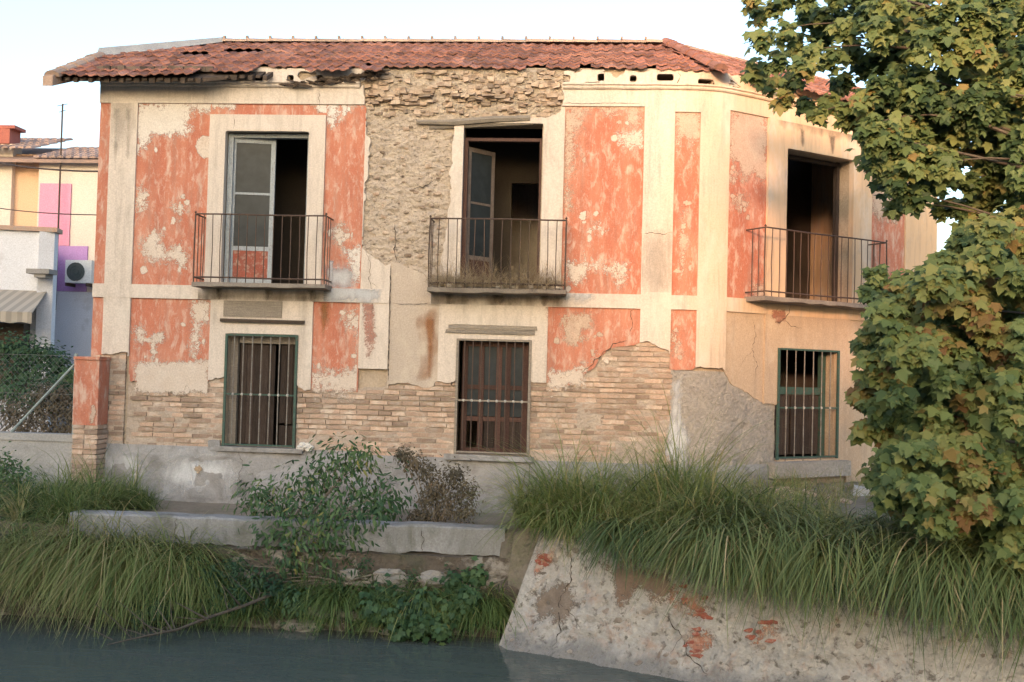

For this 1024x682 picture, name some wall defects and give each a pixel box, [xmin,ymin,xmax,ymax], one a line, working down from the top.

peeling [137,104,237,156]
peeling [135,184,150,216]
peeling [137,194,190,274]
spalling [313,68,644,292]
crack [583,310,633,372]
flaking render [296,307,455,457]
flaking render [529,309,685,465]
flaking render [534,549,556,576]
crack [554,558,579,645]